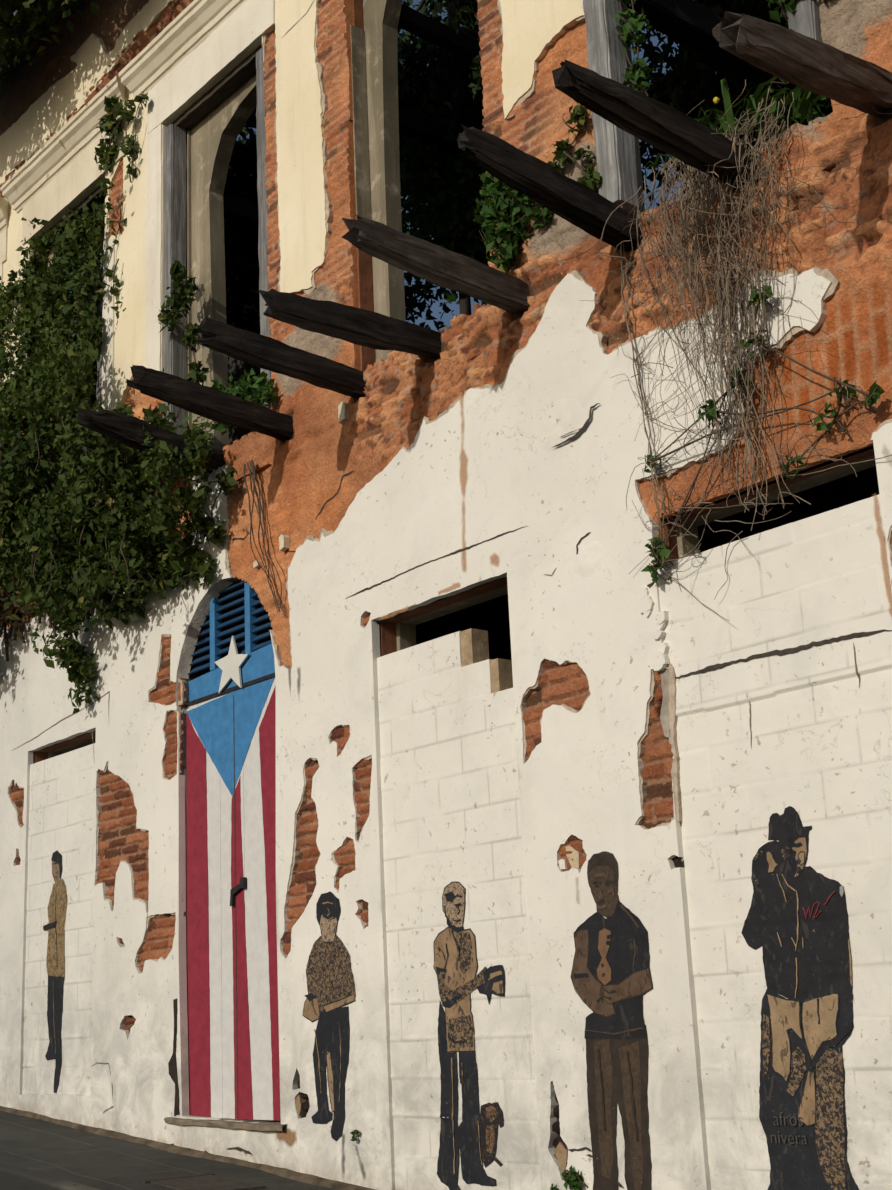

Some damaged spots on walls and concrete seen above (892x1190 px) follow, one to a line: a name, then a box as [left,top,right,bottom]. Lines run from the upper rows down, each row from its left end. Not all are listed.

flaking render [263,26,281,292]
flaking render [294,0,359,308]
flaking render [477,0,597,181]
flaking render [817,0,892,73]
flaking render [222,99,892,669]
crack [345,526,526,599]
flaking render [150,635,191,779]
flaking render [523,659,590,760]
crack [675,629,892,686]
flaking render [97,769,149,903]
flaking render [283,760,320,955]
flaking render [334,758,372,888]